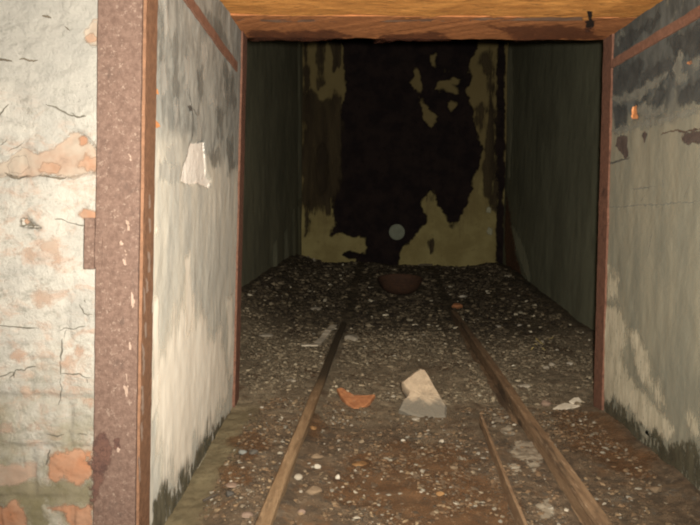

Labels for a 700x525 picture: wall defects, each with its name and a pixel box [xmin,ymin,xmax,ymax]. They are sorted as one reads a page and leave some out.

spalling [0,132,97,180]
crack [46,104,86,118]
leakage [211,61,235,172]
peeling [612,24,700,159]
crack [58,300,92,405]
leakage [152,252,234,525]
leakage [604,263,700,489]
peeling [0,499,27,525]
peeling [48,448,92,485]
corrosion [88,432,121,507]